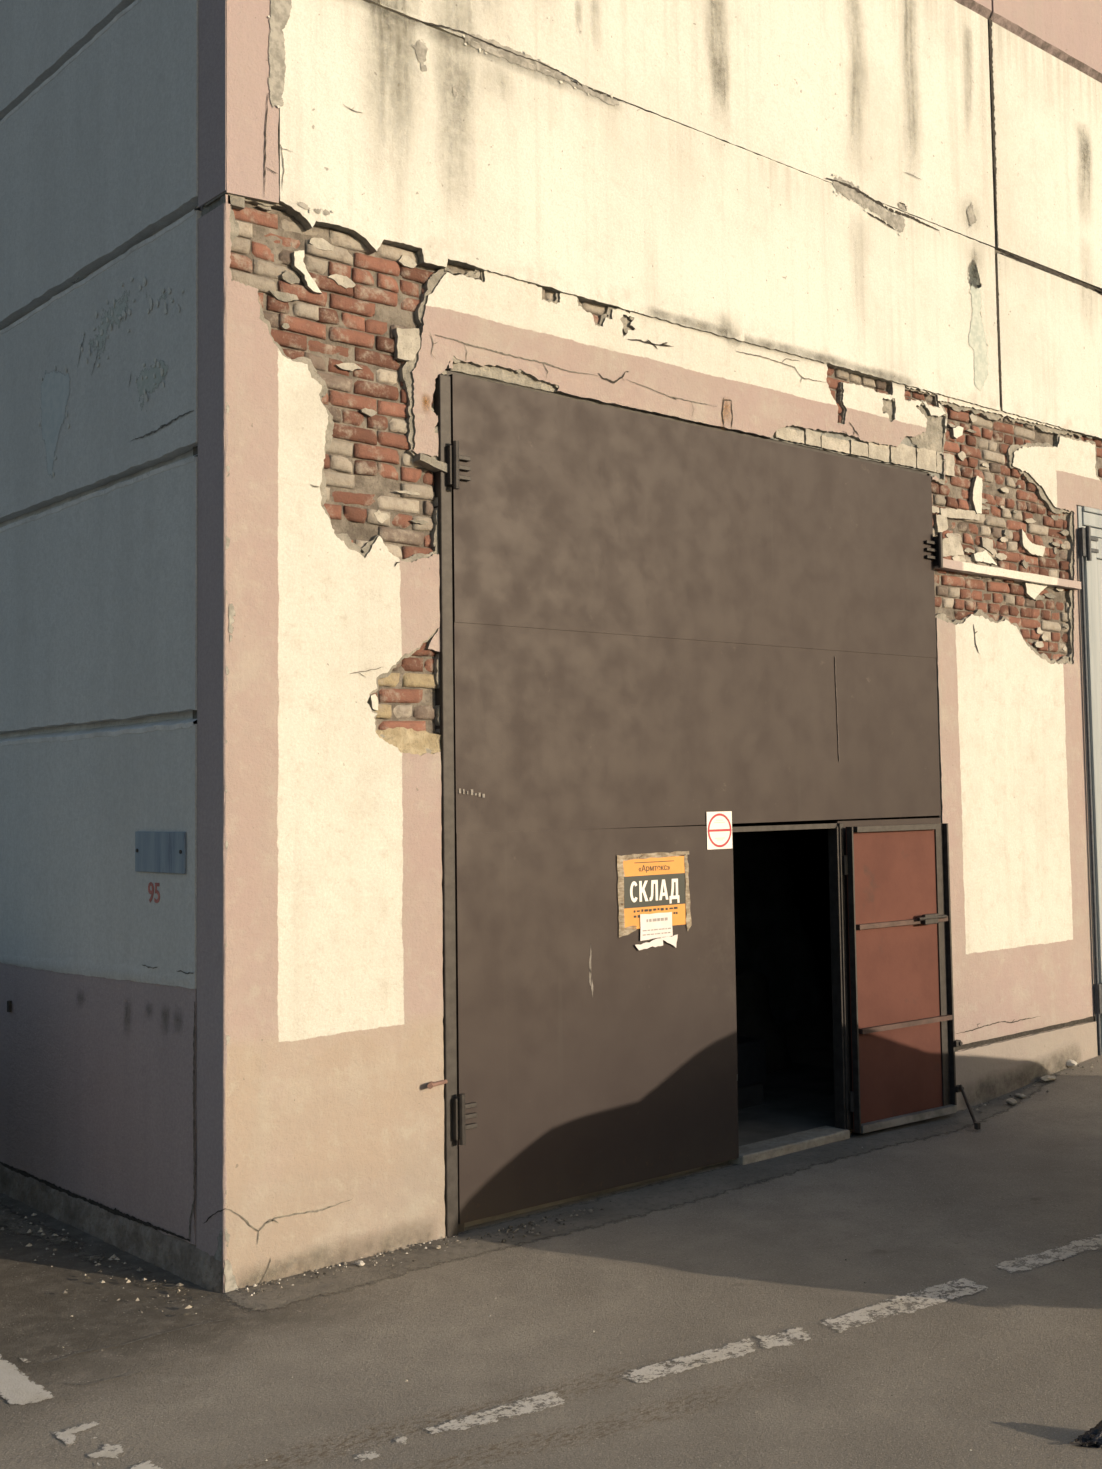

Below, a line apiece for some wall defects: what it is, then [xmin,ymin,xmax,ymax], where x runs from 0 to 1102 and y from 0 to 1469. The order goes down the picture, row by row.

peeling [268,0,292,108]
peeling [412,40,428,71]
peeling [832,173,907,236]
peeling [967,203,977,226]
flaking render [229,198,484,562]
flaking render [441,356,559,392]
flaking render [542,288,559,304]
flaking render [577,299,634,335]
peeling [968,260,989,391]
flaking render [771,365,1102,664]
flaking render [367,628,441,756]
crack [189,1001,352,1284]